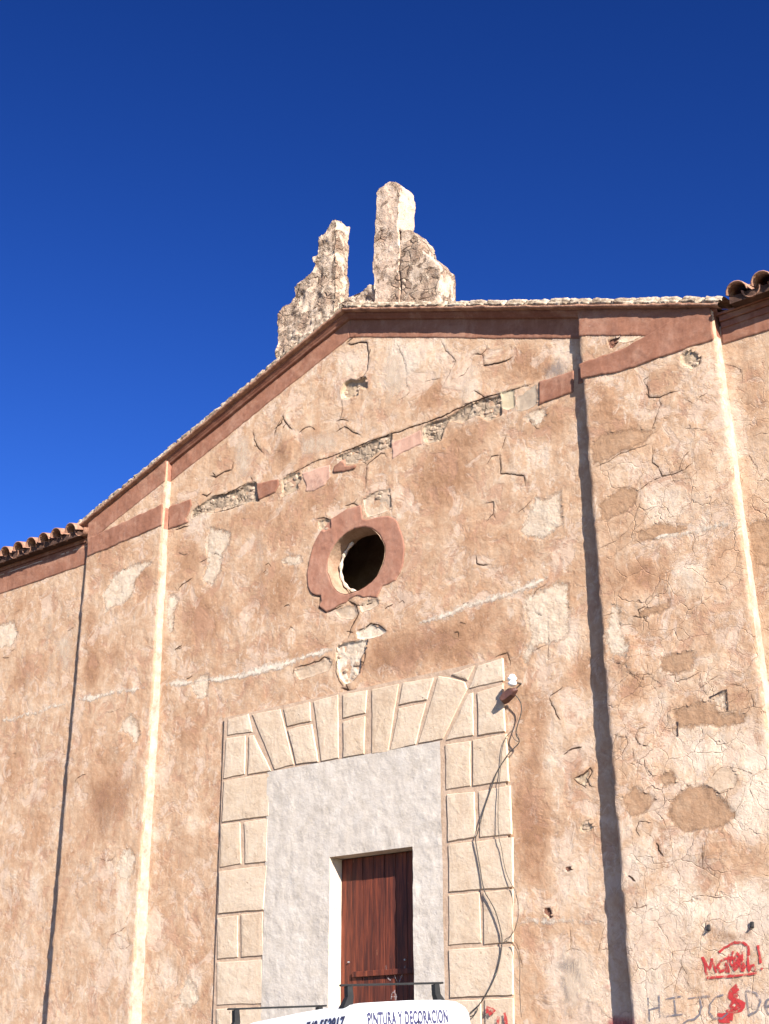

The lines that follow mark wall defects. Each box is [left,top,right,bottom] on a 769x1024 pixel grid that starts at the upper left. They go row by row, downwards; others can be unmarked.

spalling [336,433,392,464]
crack [253,343,533,522]
crack [596,377,705,548]
spalling [192,483,259,517]
spalling [281,473,301,497]
spalling [363,488,392,517]
spalling [335,598,379,620]
spalling [294,624,386,684]
crack [608,656,754,712]
crack [565,746,593,787]